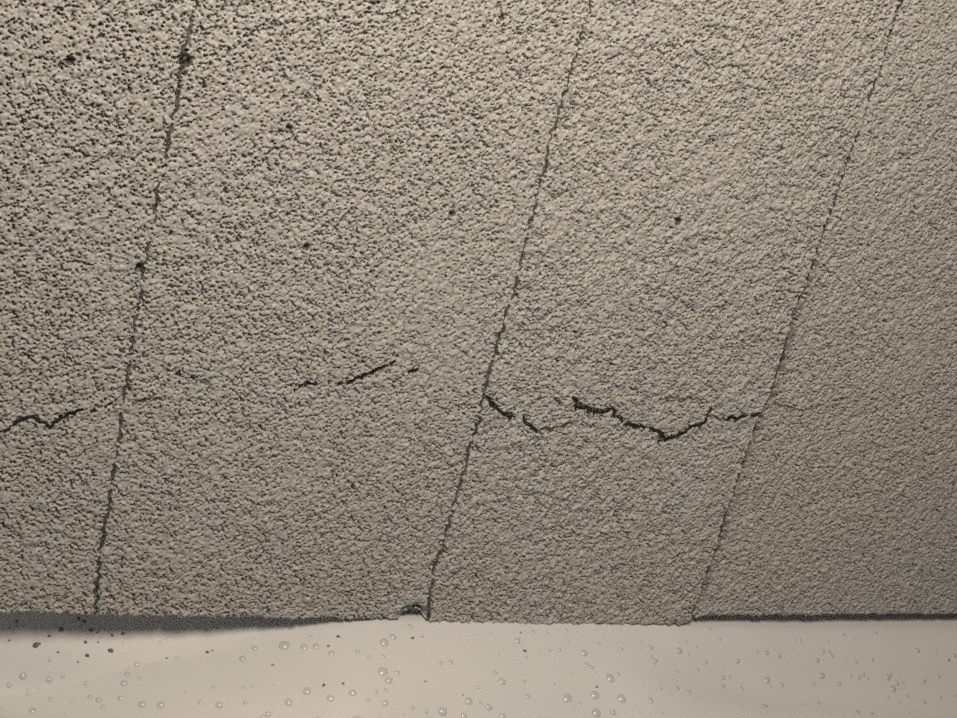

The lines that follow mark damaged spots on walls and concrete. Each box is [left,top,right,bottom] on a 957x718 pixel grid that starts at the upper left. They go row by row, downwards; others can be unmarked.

crack [0,0,197,614]
crack [293,360,419,392]
crack [425,0,903,621]